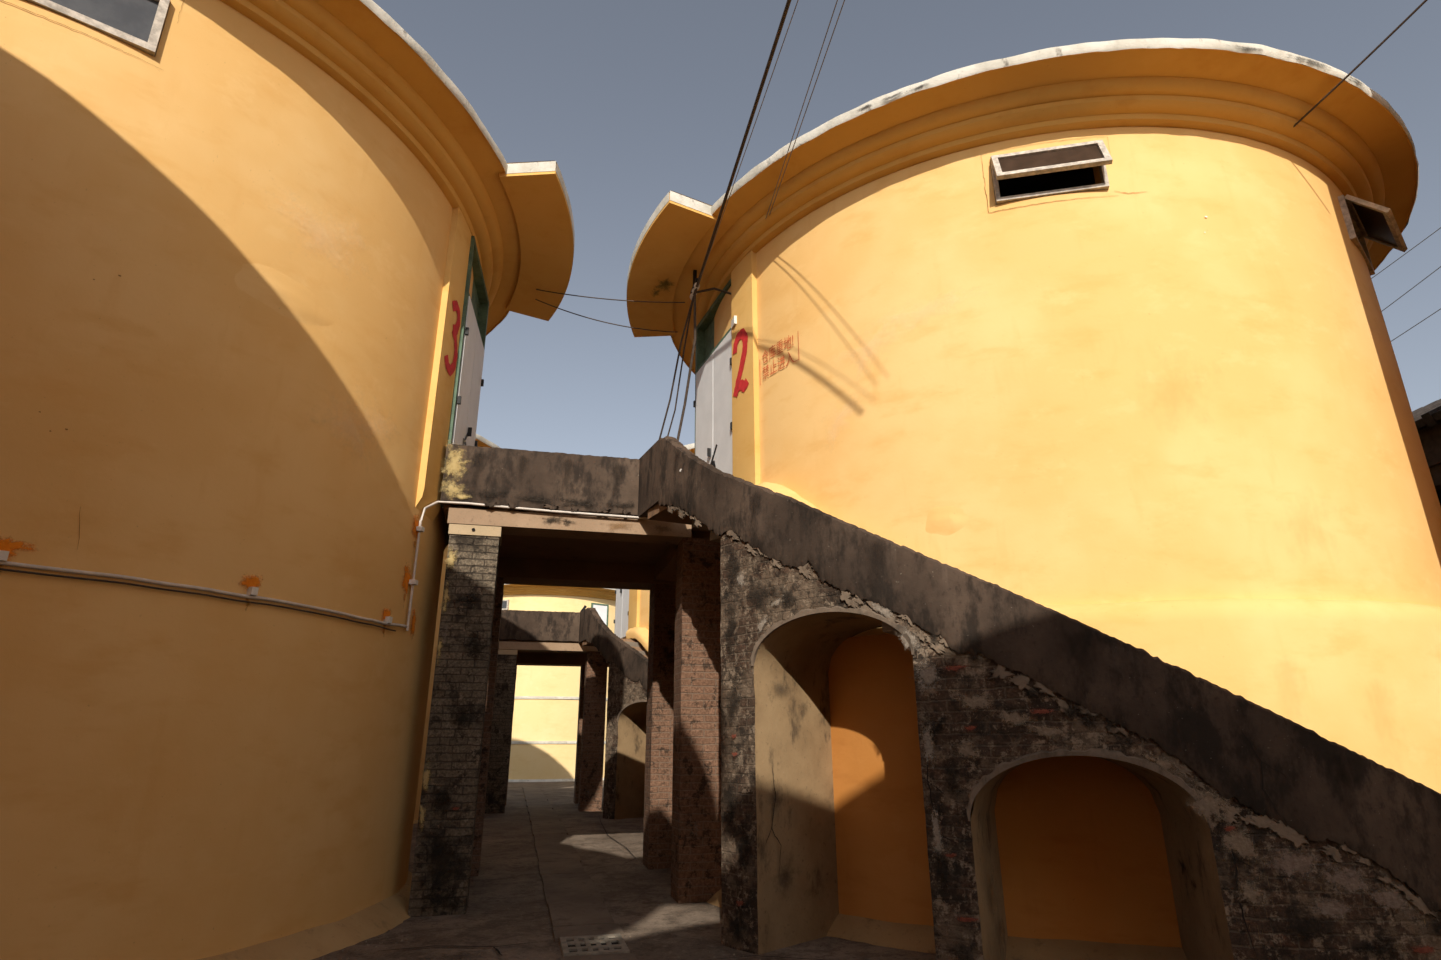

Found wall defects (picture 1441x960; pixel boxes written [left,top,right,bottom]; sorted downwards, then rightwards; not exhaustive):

water stain [523,496,592,525]
water stain [727,557,796,632]
water stain [872,603,891,618]
flaking render [840,591,967,671]
water stain [901,631,940,694]
flaking render [955,665,1129,758]
water stain [931,812,949,883]
flaking render [1144,750,1437,919]